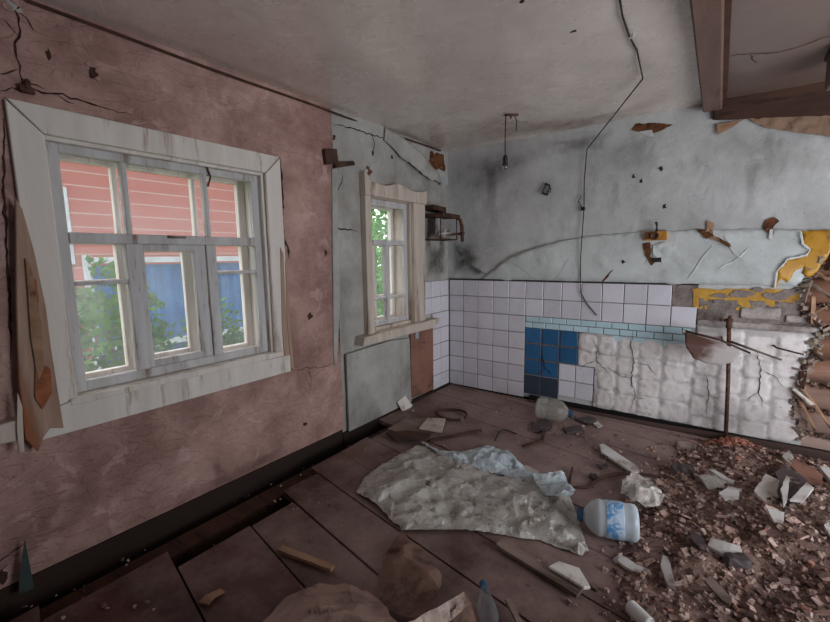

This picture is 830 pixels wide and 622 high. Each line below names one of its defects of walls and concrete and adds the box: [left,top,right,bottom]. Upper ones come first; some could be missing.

crack [0,7,131,115]
crack [1,123,12,359]
peeling [697,229,732,247]
crack [580,332,656,408]
peeling [563,251,830,443]
crack [747,352,783,405]